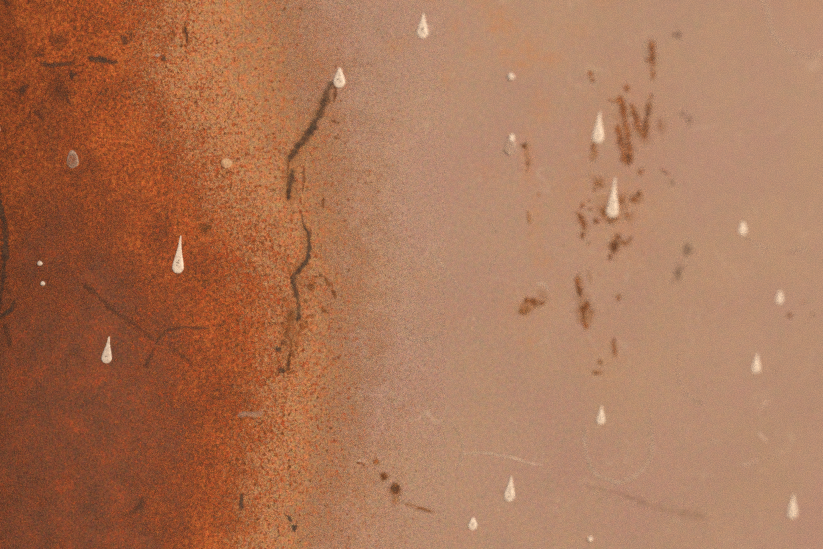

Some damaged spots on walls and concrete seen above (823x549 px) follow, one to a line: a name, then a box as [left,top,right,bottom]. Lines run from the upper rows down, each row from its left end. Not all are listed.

crack [286,83,338,200]
rust [608,85,653,164]
crack [0,201,15,317]
rust [0,0,431,549]
crack [273,221,318,375]
rust [519,298,545,314]
rust [576,277,592,328]
rust [576,200,616,238]